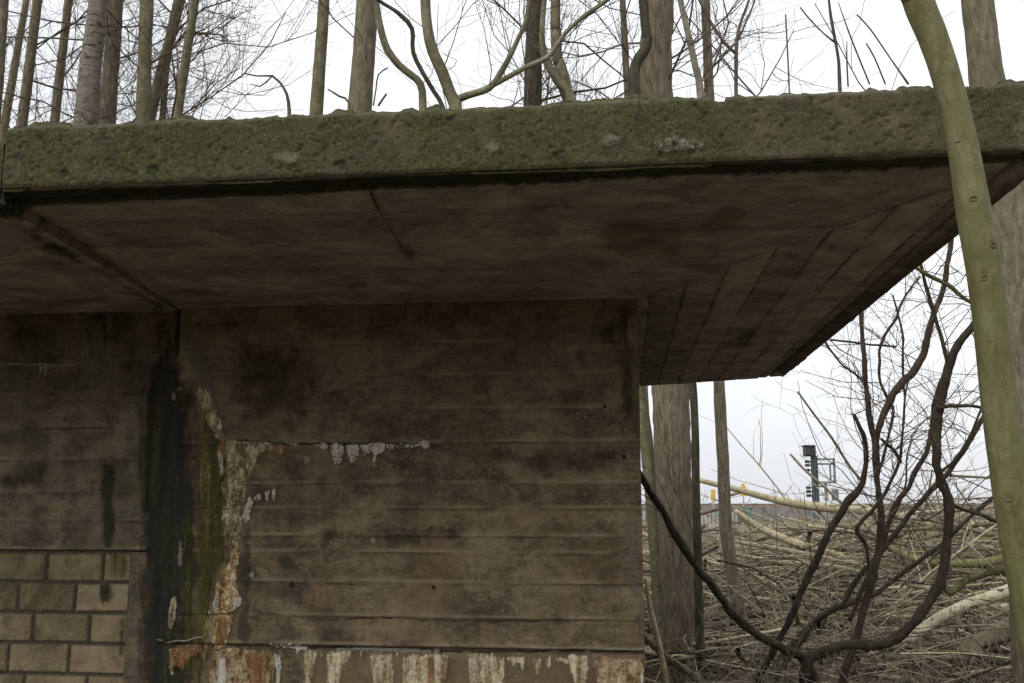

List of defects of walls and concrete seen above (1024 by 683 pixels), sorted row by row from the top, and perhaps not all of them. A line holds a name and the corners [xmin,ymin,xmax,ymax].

water stain [316,441,429,466]
water stain [127,288,250,683]
water stain [101,464,125,570]
peeling [212,488,276,649]
peeling [168,596,177,629]
rust [169,644,282,683]
water stain [270,643,640,683]